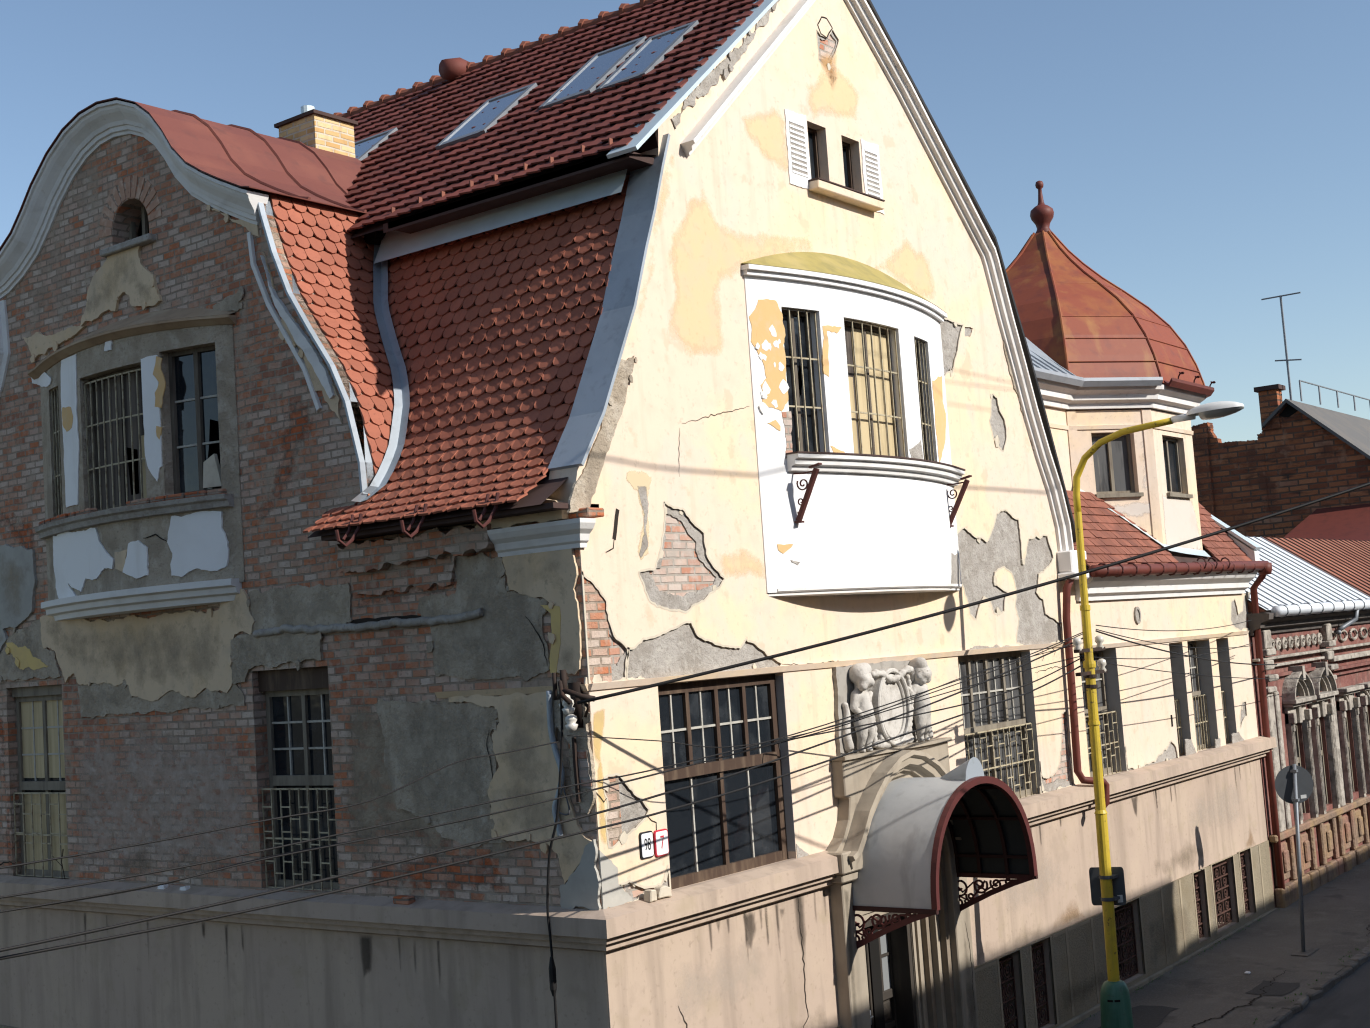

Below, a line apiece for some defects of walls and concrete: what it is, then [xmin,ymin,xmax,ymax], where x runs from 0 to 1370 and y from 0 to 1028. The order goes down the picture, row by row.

peeling [153,356,166,408]
peeling [749,299,793,459]
flaking render [1003,340,1024,416]
peeling [62,407,73,431]
flaking render [989,393,1007,452]
flaking render [582,471,782,684]
peeling [777,544,800,565]
flaking render [951,508,1064,651]
spalling [552,690,650,849]
spalling [371,854,495,888]
spalling [620,866,671,902]